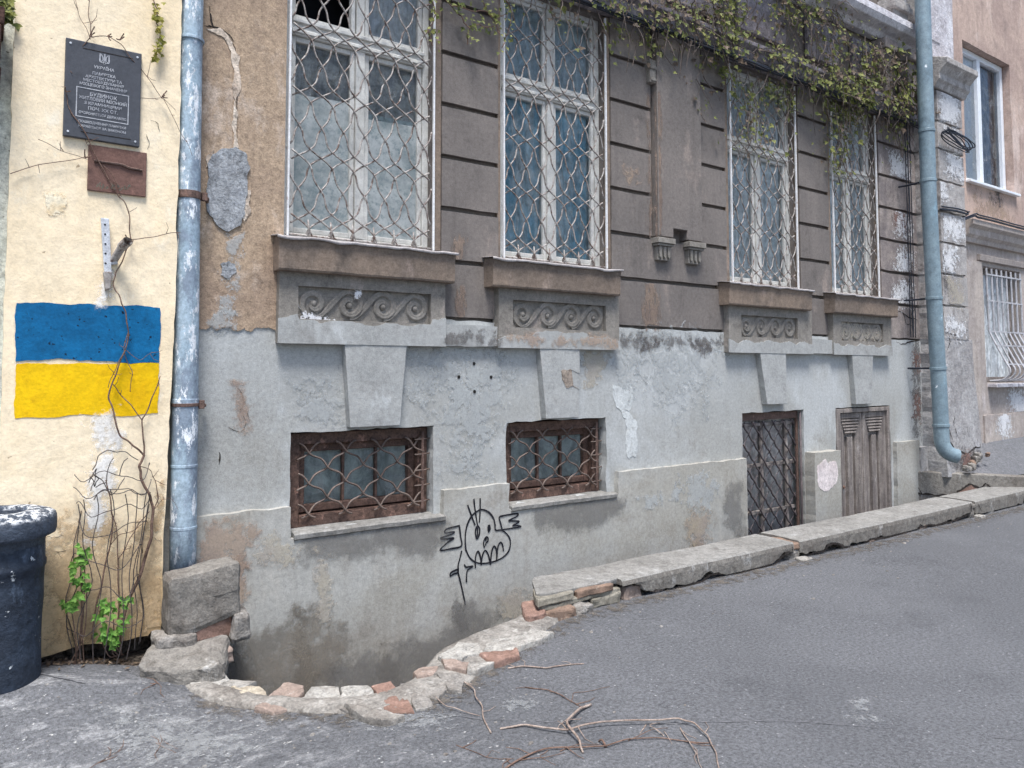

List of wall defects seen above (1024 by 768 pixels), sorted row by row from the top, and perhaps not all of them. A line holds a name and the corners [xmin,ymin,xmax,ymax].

crack [206,7,236,51]
peeling [885,148,912,180]
peeling [890,210,916,312]
peeling [938,92,967,344]
peeling [403,325,725,484]
leakage [226,523,533,695]